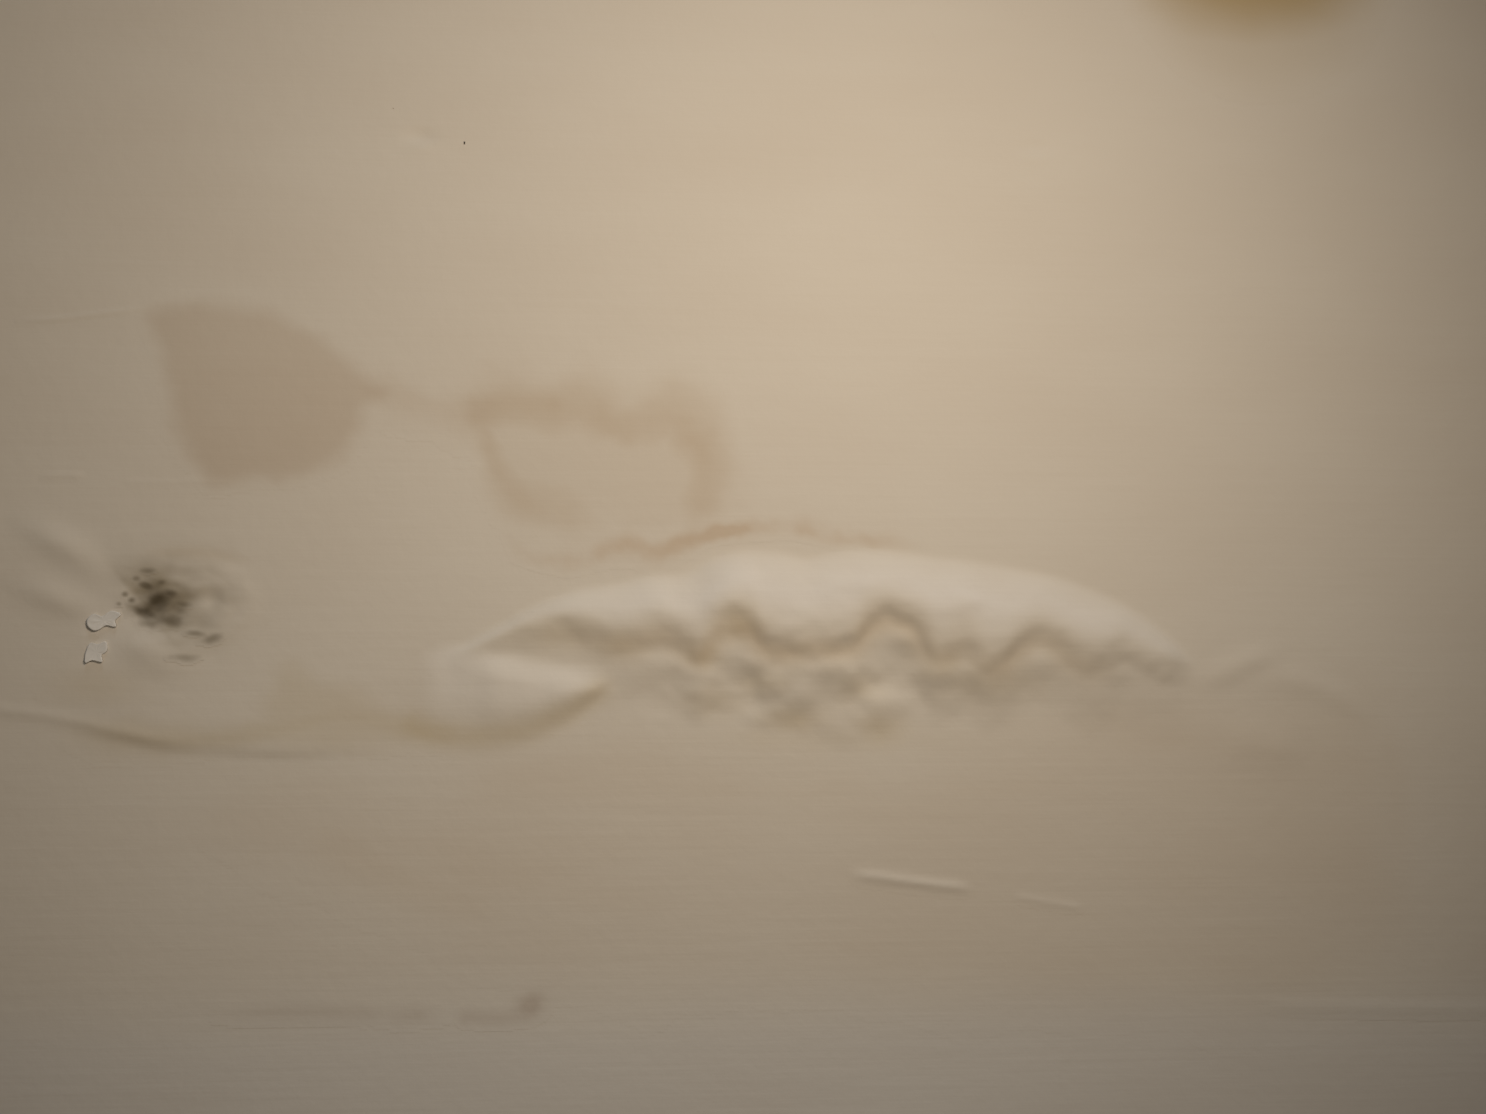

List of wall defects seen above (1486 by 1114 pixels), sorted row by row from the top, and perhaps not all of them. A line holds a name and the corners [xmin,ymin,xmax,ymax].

damp [136,289,929,579]
peeling [0,501,276,681]